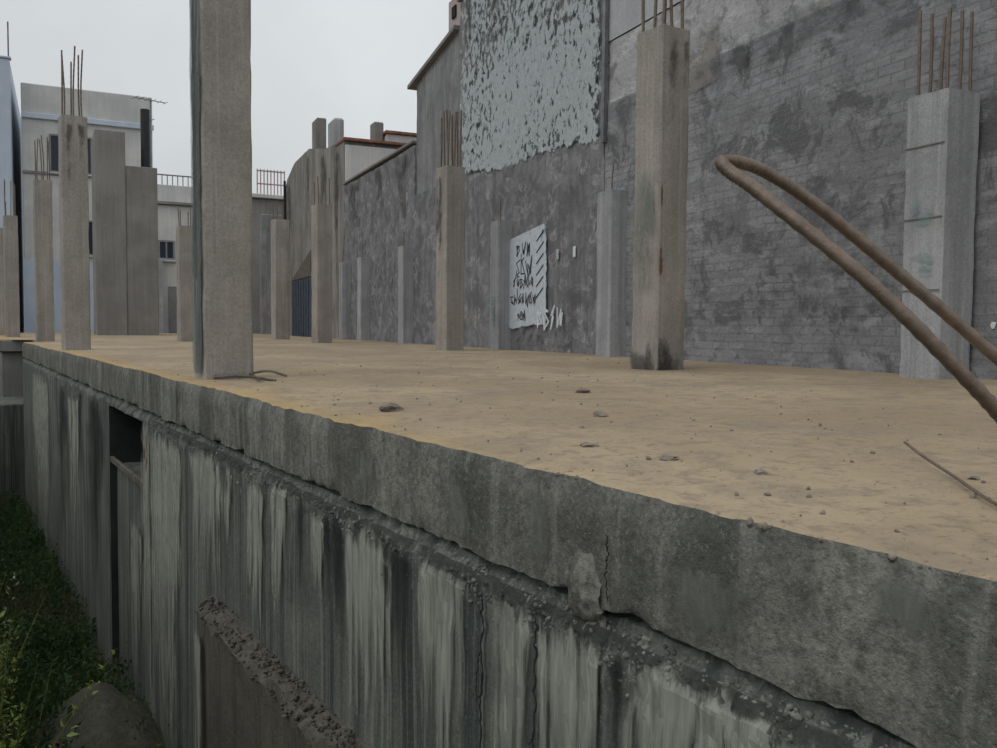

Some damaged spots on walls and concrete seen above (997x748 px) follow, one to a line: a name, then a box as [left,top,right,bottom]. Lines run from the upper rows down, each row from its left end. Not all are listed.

peeling [440,0,602,174]
leakage [33,374,102,546]
leakage [131,389,856,748]
crack [603,535,611,604]
crack [475,592,485,748]